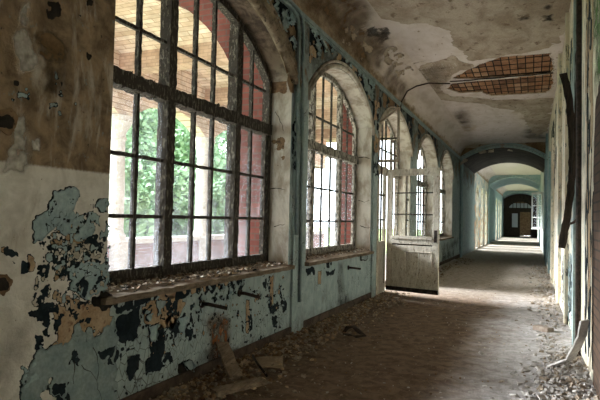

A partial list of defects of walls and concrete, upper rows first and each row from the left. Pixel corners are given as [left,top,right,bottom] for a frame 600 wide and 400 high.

water stain [14,4,68,70]
spalling [46,1,62,20]
peeling [267,0,297,56]
water stain [309,0,390,67]
peeling [272,52,294,94]
spalling [0,80,30,135]
peeling [368,0,571,211]
water stain [4,117,40,173]
peeling [271,112,296,170]
peeling [0,186,287,400]
peeling [306,248,371,285]